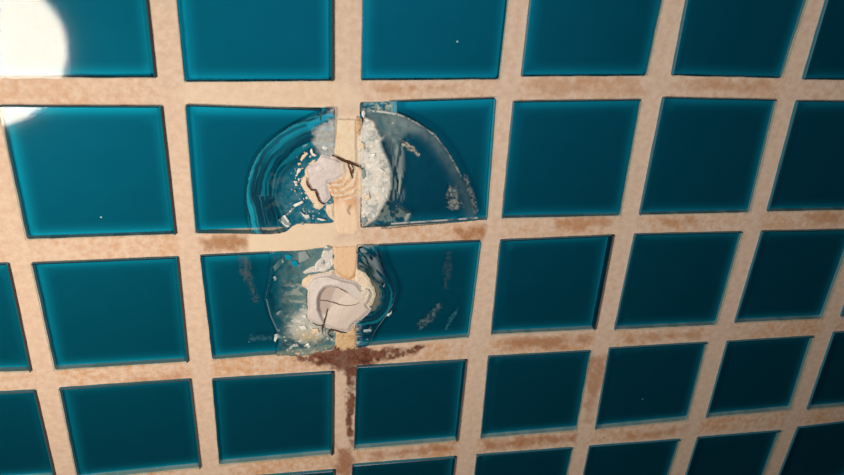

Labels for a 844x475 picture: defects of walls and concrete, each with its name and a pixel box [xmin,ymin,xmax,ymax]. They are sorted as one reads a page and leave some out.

crack [307,286,358,338]
rust [297,345,424,441]